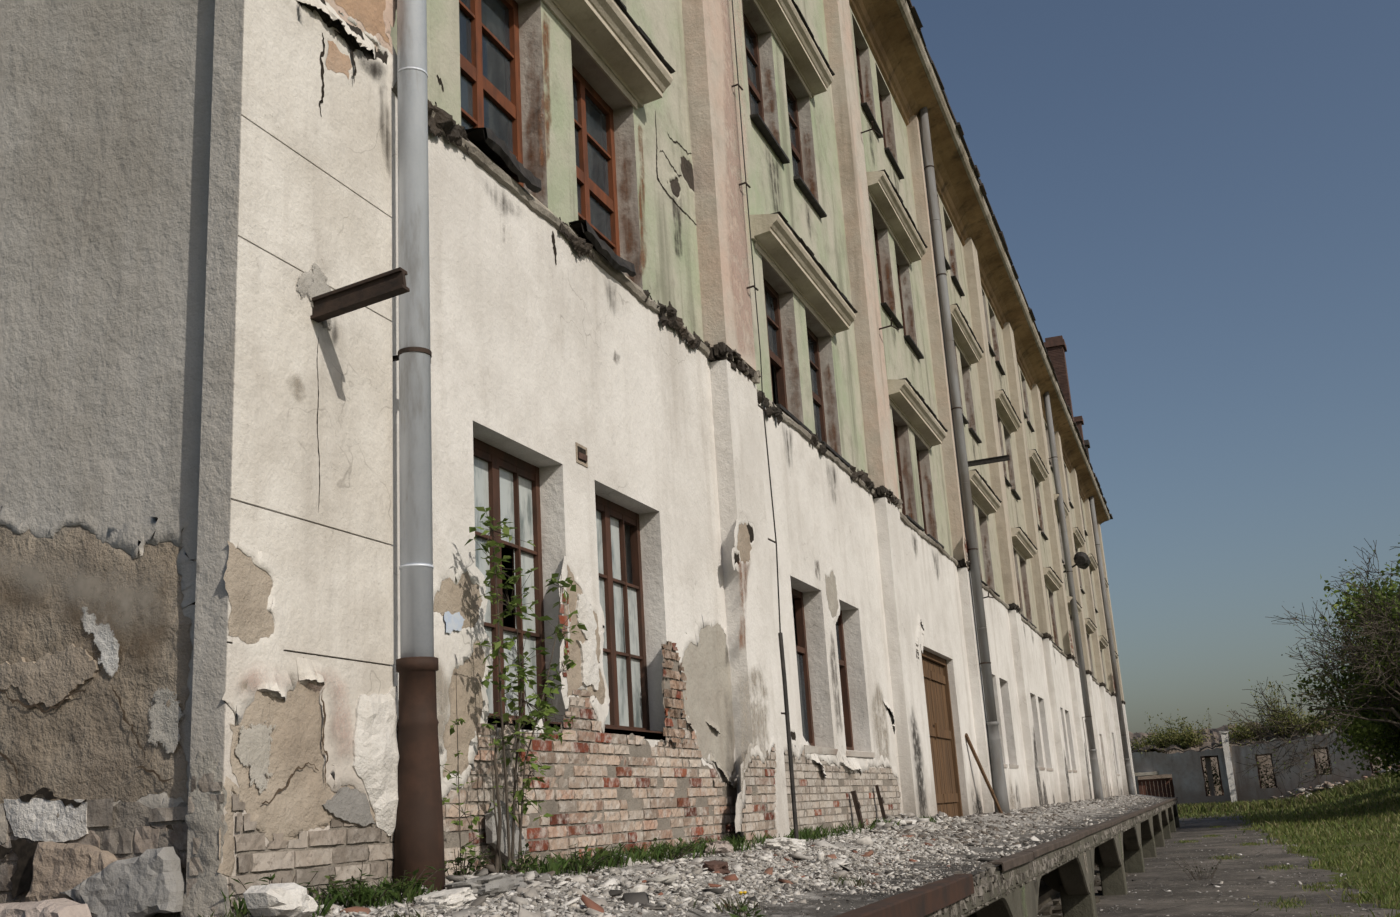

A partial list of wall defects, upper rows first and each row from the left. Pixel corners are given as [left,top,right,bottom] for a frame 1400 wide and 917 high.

spalling [0,505,394,917]